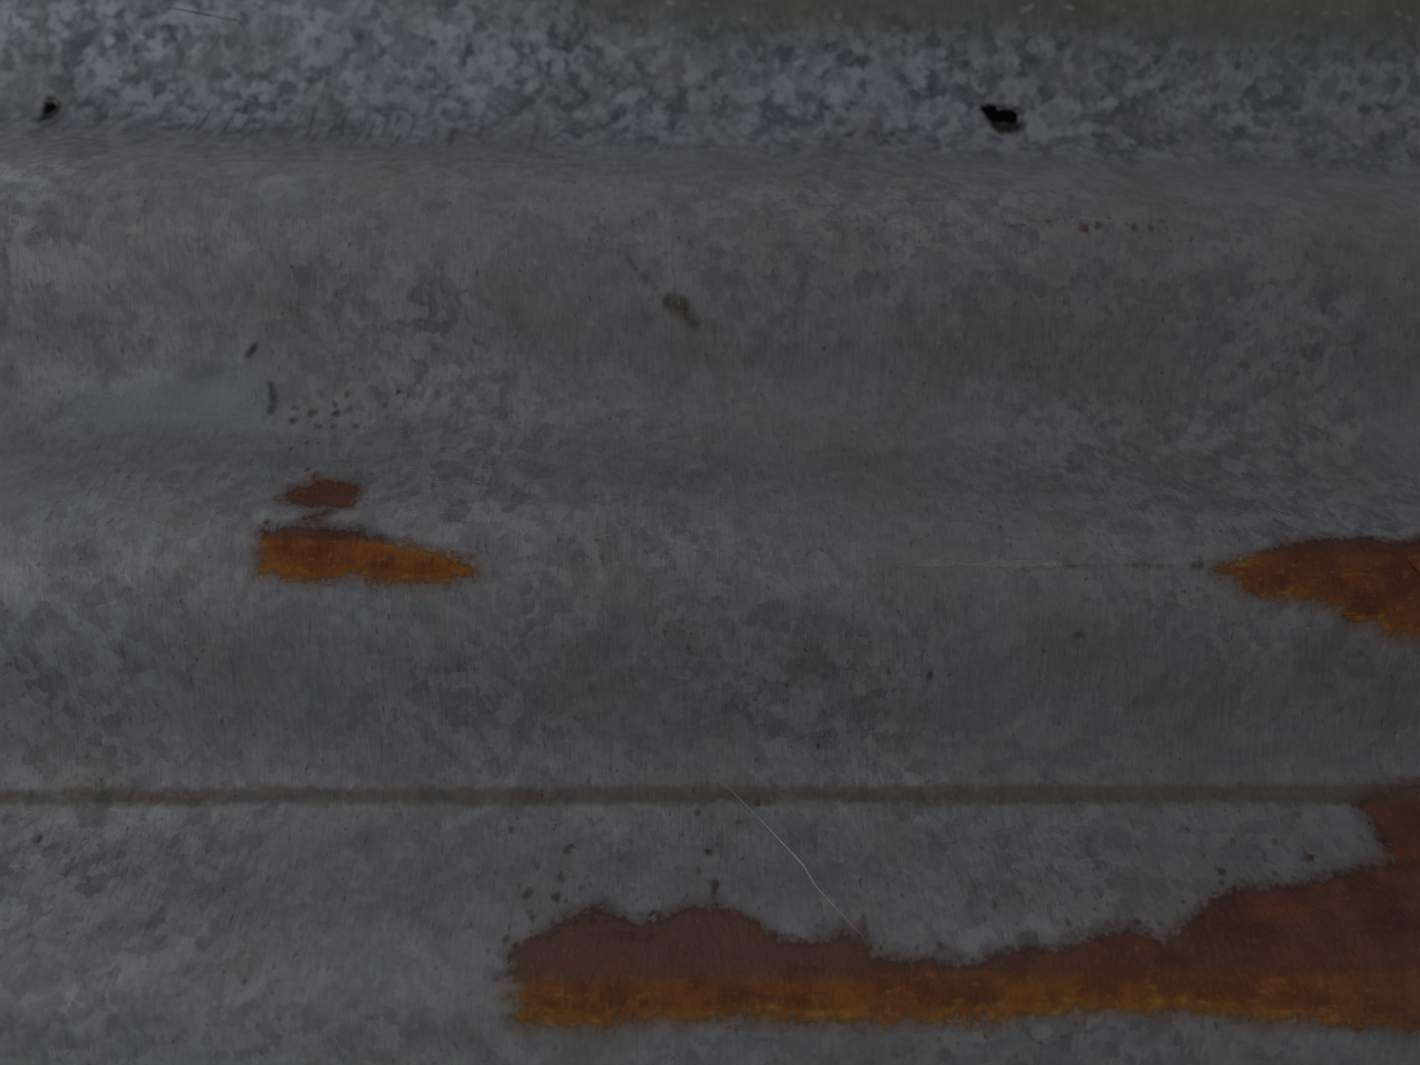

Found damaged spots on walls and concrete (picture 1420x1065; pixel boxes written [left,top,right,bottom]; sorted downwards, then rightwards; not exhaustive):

rust [256,476,478,587]
rust [1213,535,1420,638]
rust [497,784,1420,1034]